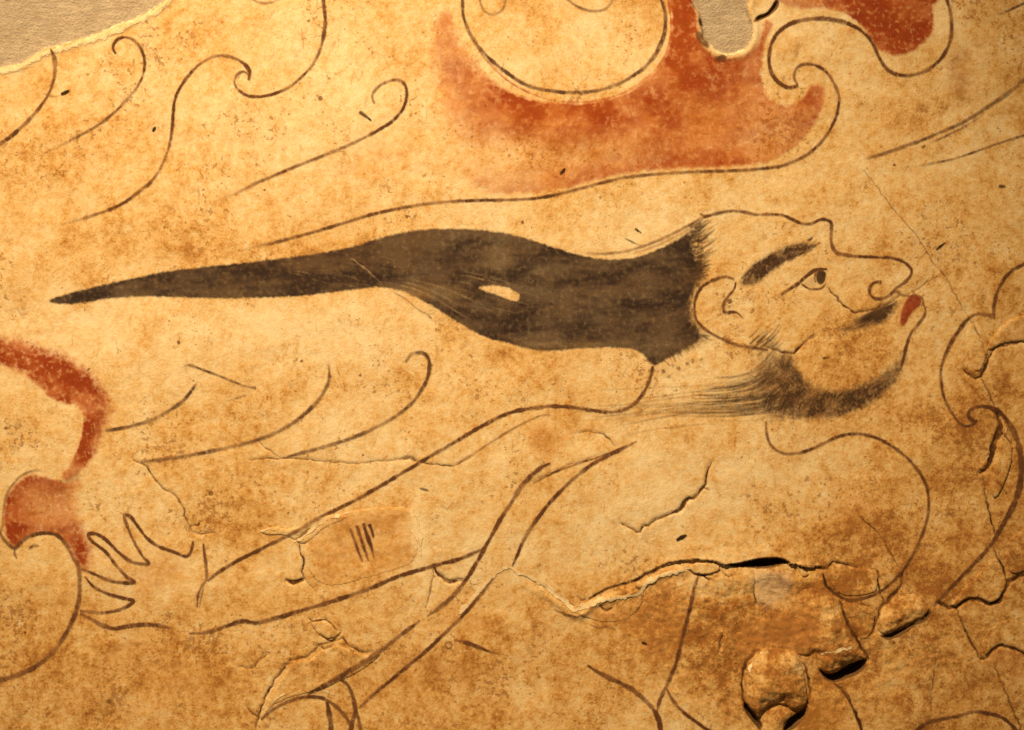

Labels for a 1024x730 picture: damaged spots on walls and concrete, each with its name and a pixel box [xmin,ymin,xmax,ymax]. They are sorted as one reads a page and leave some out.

spalling [0,0,172,75]
spalling [691,0,755,61]
crack [136,461,205,534]
crack [621,462,712,533]
crack [938,341,1024,660]
crack [433,559,760,618]
crack [779,551,903,658]
crack [740,653,755,702]
crack [805,666,862,730]